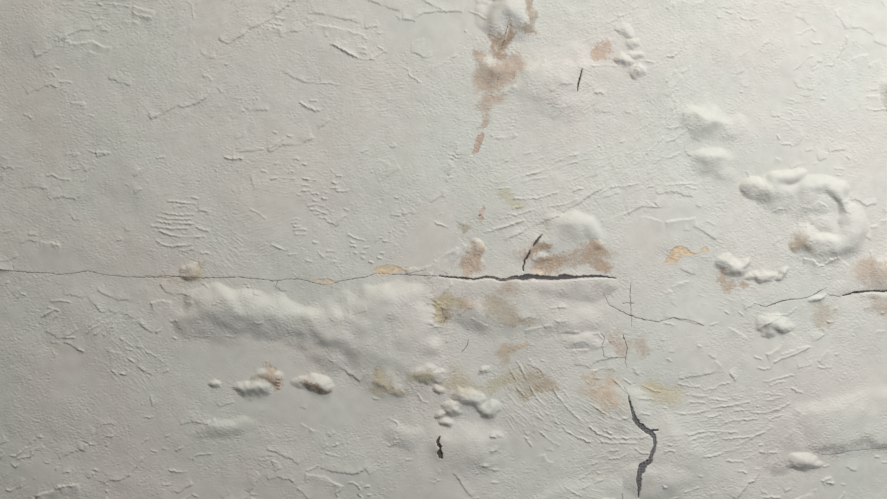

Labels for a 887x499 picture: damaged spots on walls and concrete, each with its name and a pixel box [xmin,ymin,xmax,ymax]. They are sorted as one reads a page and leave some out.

crack [17,234,704,366]
crack [755,287,887,307]
crack [622,387,658,499]